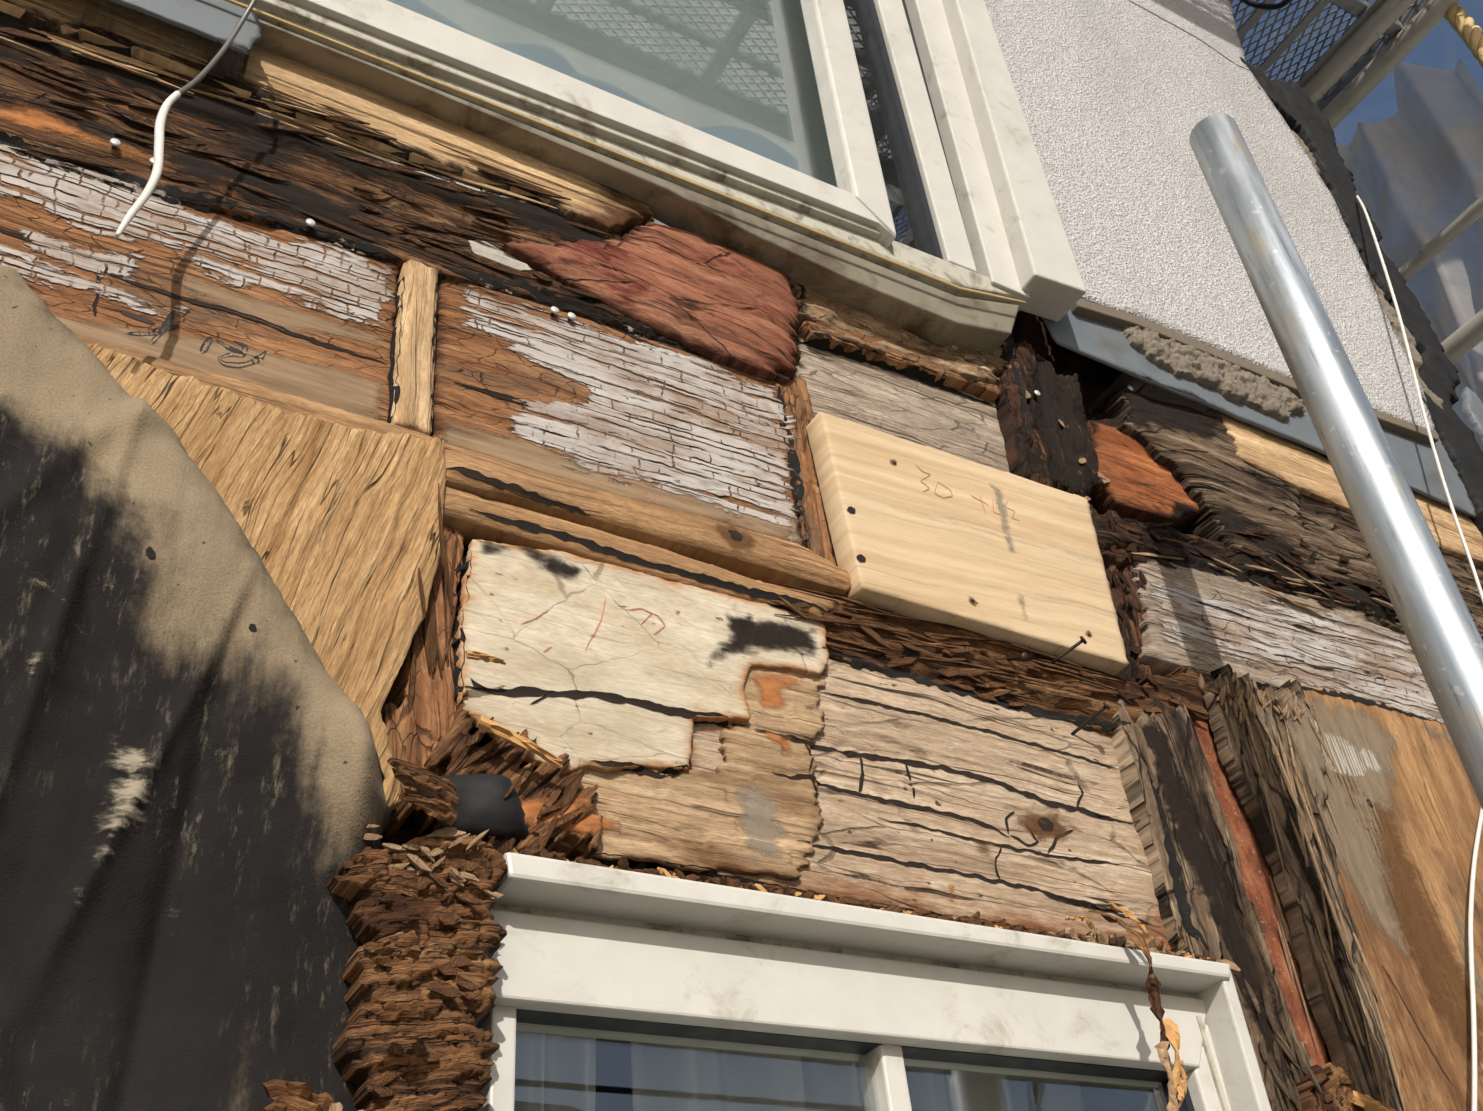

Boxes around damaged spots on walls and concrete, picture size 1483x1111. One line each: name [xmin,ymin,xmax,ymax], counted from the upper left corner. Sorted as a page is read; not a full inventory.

leakage [0,0,609,243]
peeling [0,144,396,421]
peeling [468,240,532,271]
peeling [444,282,802,543]
peeling [520,798,614,833]
crack [464,678,1159,927]
leakage [1142,723,1274,1052]